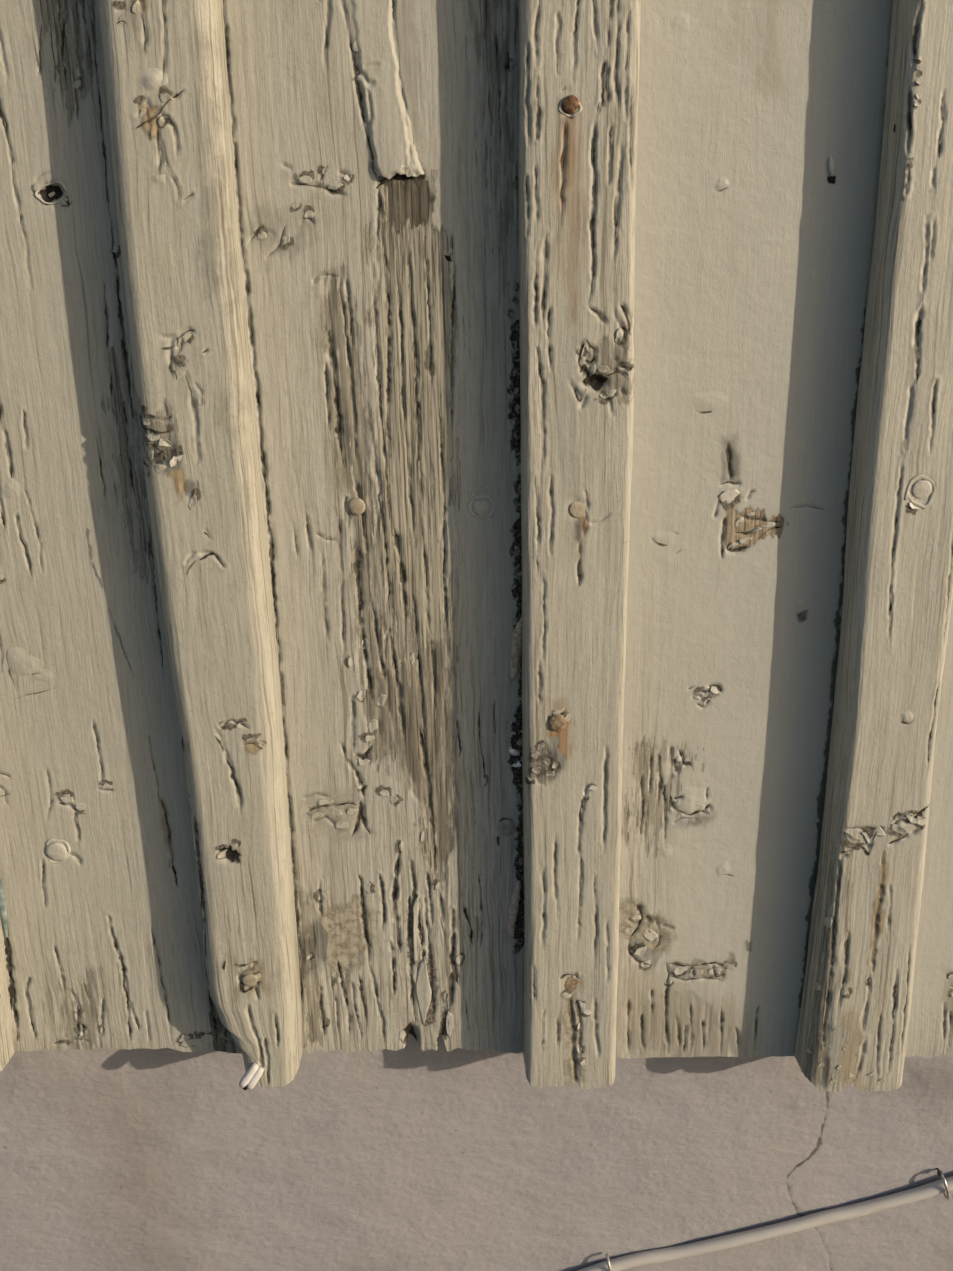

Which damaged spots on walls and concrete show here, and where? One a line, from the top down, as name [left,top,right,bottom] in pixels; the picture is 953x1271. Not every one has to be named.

peeling [33,0,98,129]
peeling [113,0,147,53]
peeling [253,226,294,250]
peeling [293,165,354,195]
peeling [99,286,201,584]
peeling [307,0,470,886]
peeling [714,444,797,557]
peeling [622,735,705,858]
peeling [294,875,381,1047]
peeling [383,893,439,1041]
peeling [619,902,737,987]
peeling [804,802,931,1091]